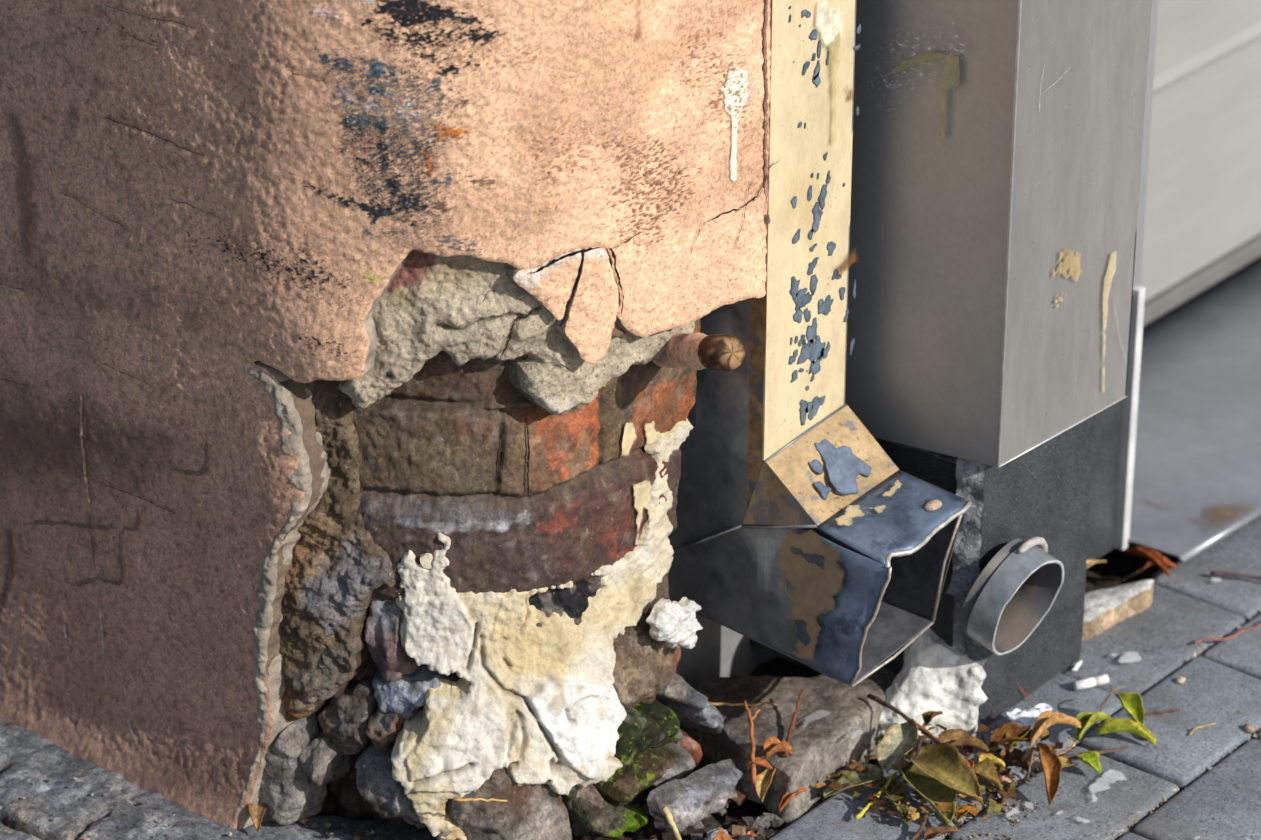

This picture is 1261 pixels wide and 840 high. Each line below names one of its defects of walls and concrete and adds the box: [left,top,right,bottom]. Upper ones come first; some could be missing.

peeling [789,6,829,87]
crack [690,155,785,253]
crack [497,232,641,364]
peeling [789,152,856,426]
spalling [229,245,696,828]
peeling [778,530,844,660]
peeling [808,439,902,526]